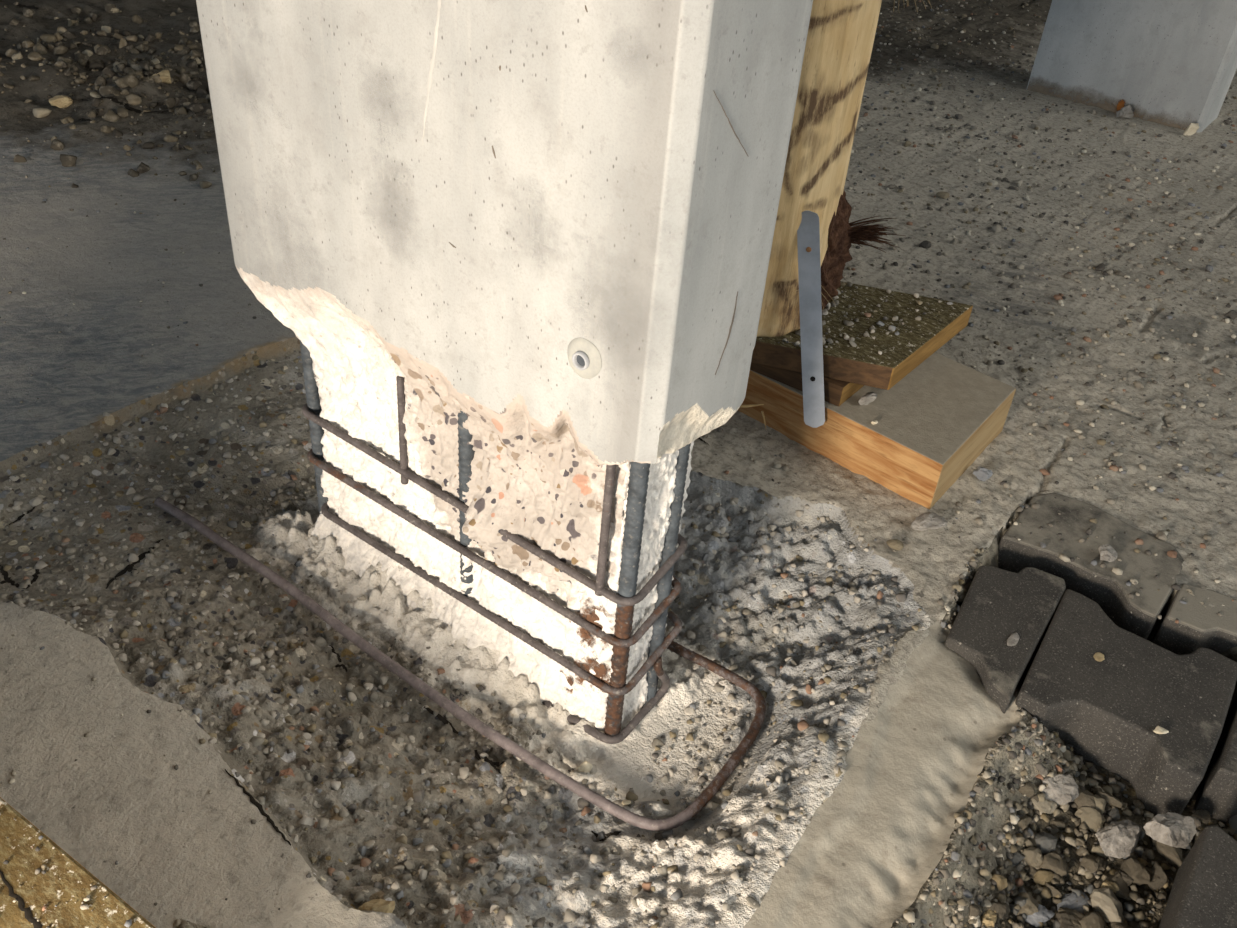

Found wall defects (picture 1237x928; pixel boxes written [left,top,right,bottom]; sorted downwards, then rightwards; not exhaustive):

crack [105,539,163,589]
spalling [0,265,930,928]
rust [560,599,613,694]